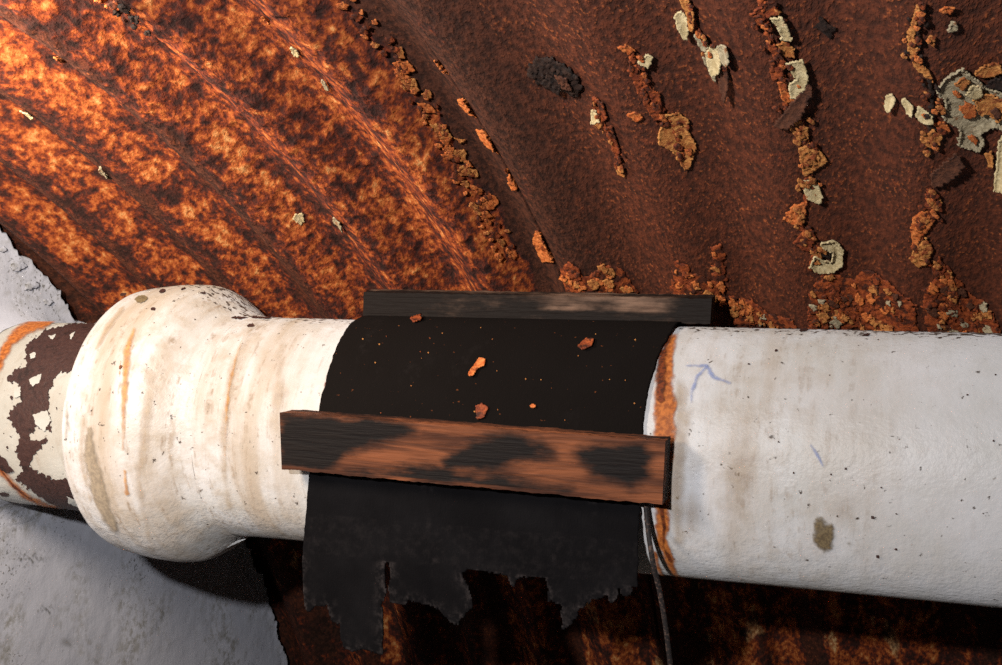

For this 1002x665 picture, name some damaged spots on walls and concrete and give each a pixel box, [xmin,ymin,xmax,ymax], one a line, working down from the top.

corrosion [94,0,151,37]
peeling [673,0,729,104]
corrosion [336,0,518,263]
peeling [749,0,844,274]
peeling [884,2,1002,291]
corrosion [532,230,639,294]
corrosion [669,243,1001,333]
corrosion [0,321,55,369]
peeling [0,322,96,511]
corrosion [654,333,677,470]
peeling [84,428,117,531]
corrosion [654,492,676,576]